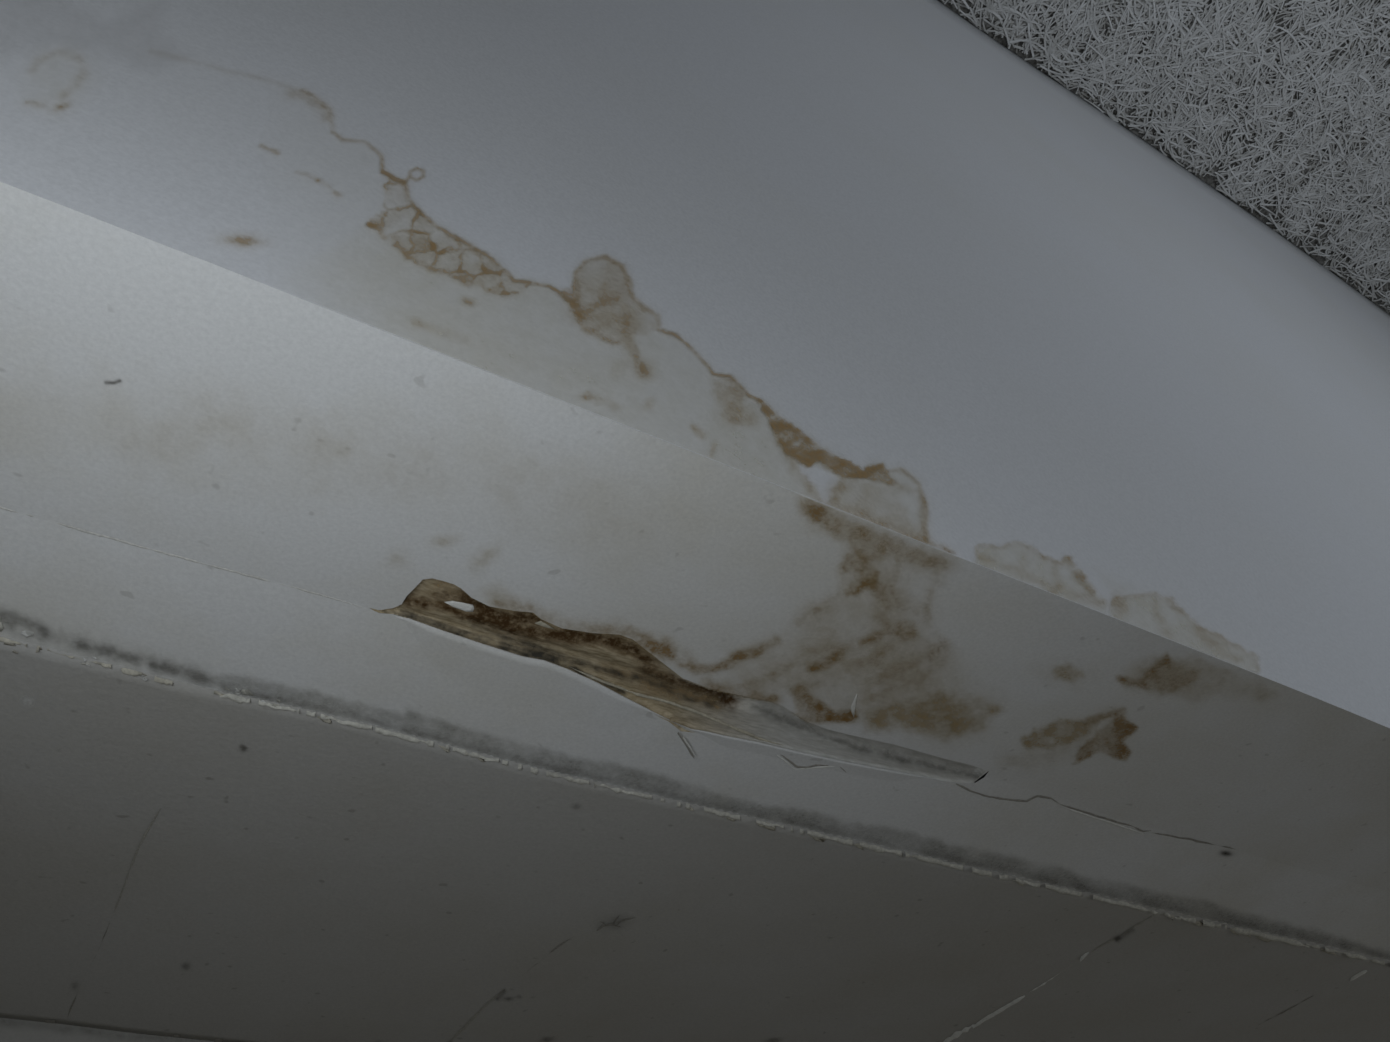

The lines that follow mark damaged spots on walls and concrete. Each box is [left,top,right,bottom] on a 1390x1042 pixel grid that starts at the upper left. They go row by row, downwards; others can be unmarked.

damp [381,159,406,189]
damp [367,204,631,343]
damp [710,369,895,484]
flaking render [370,578,988,783]
crack [956,783,1236,850]